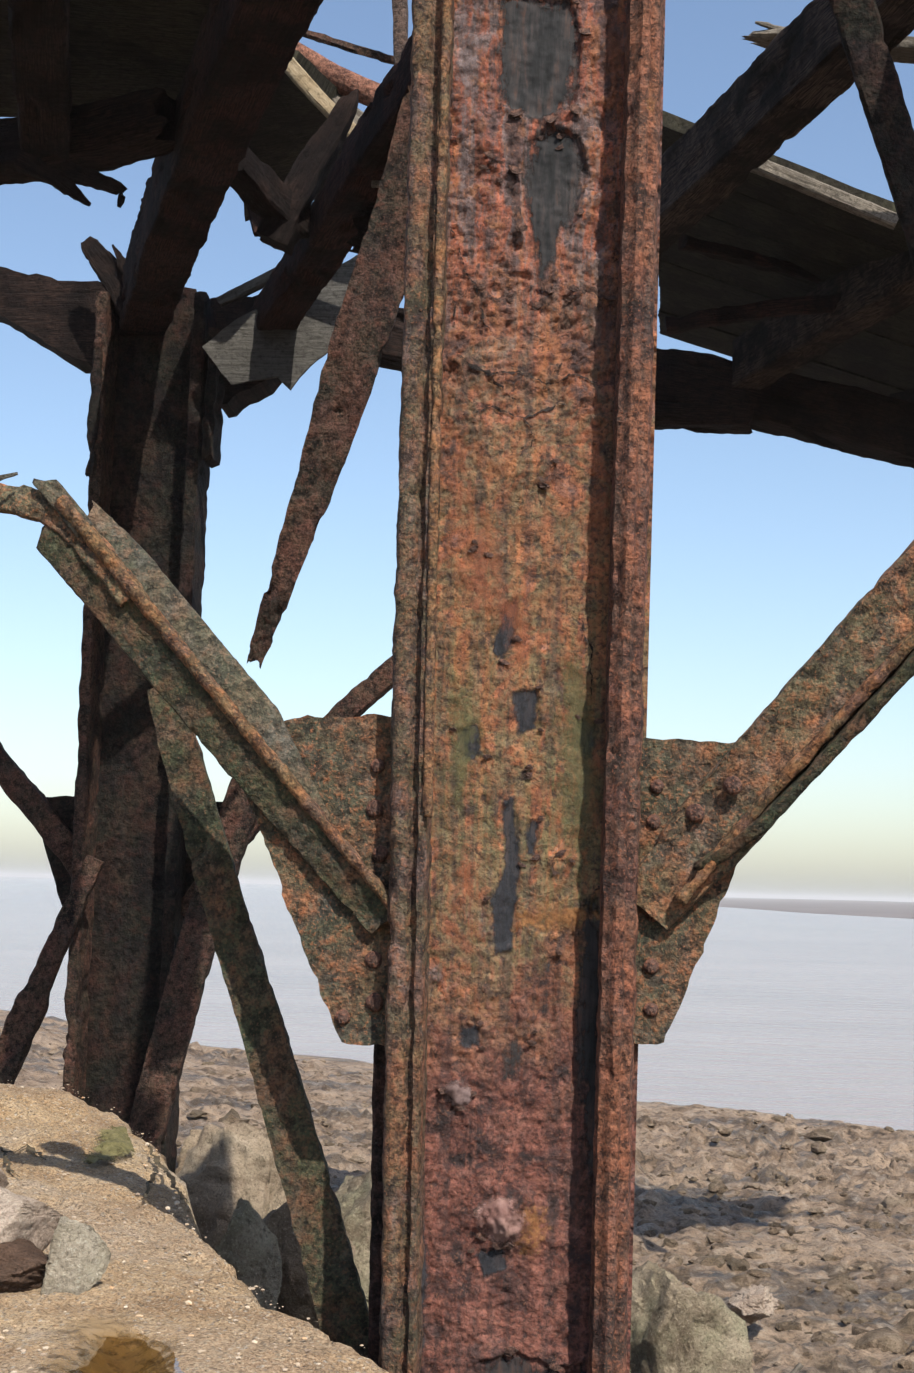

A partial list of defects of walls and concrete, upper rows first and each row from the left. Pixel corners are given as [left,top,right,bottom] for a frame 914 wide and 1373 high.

peeling [455,0,591,310]
peeling [493,599,522,665]
peeling [512,685,544,733]
peeling [483,796,544,954]
rust [517,902,600,933]